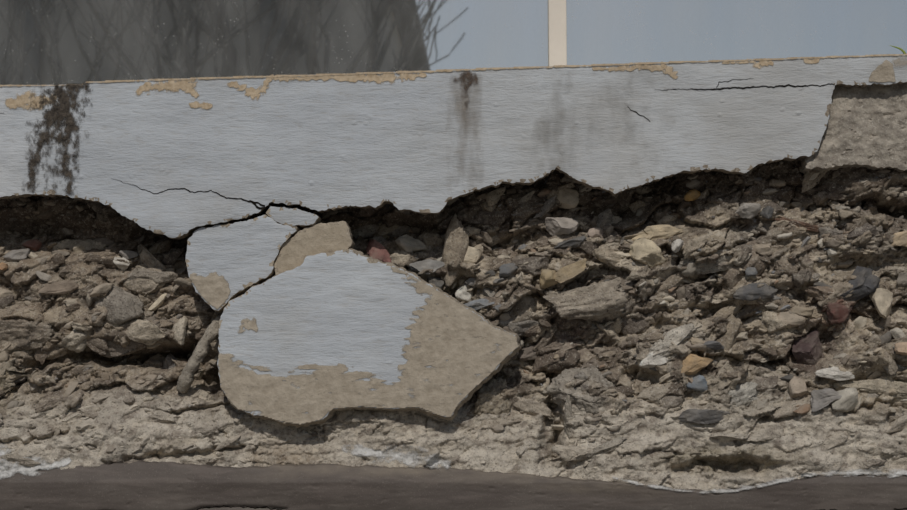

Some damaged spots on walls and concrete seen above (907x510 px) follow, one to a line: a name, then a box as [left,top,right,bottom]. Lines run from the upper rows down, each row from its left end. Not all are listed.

peeling [0,85,64,110]
peeling [82,53,907,109]
water stain [23,84,76,192]
crack [114,179,265,209]
spalling [0,158,907,491]